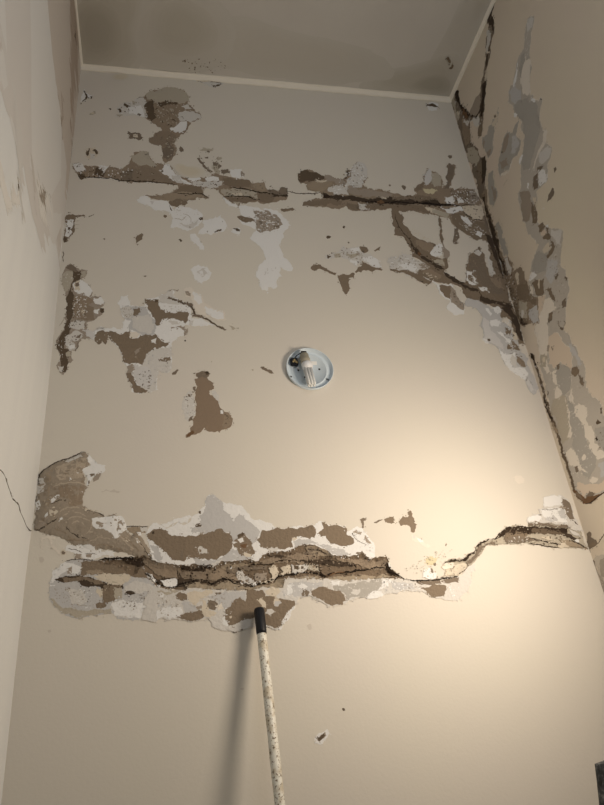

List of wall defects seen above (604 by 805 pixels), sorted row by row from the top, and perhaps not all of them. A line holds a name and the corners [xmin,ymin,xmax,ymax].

crack [451,6,539,327]
peeling [55,87,540,395]
crack [438,216,460,244]
peeling [182,371,234,438]
crack [529,353,604,504]
peeling [40,536,477,633]
peeling [140,494,417,569]
crack [98,523,604,591]
peeling [527,494,604,592]